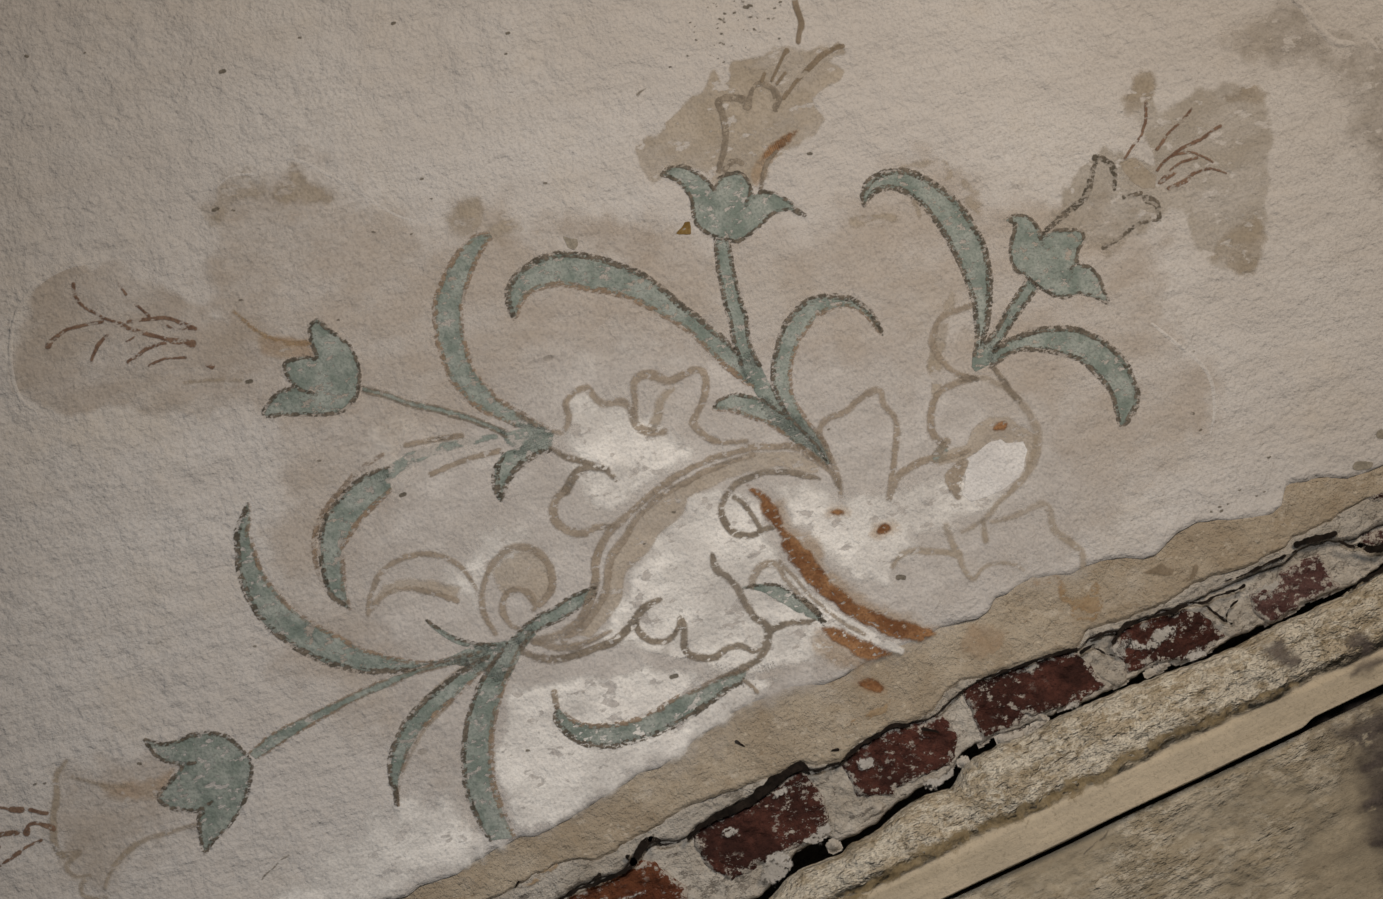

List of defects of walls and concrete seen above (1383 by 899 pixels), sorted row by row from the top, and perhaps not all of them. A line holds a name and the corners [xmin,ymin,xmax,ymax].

water stain [644,43,844,186]
water stain [1127,73,1154,101]
flaking render [277,335,1383,899]
crack [559,531,1383,899]